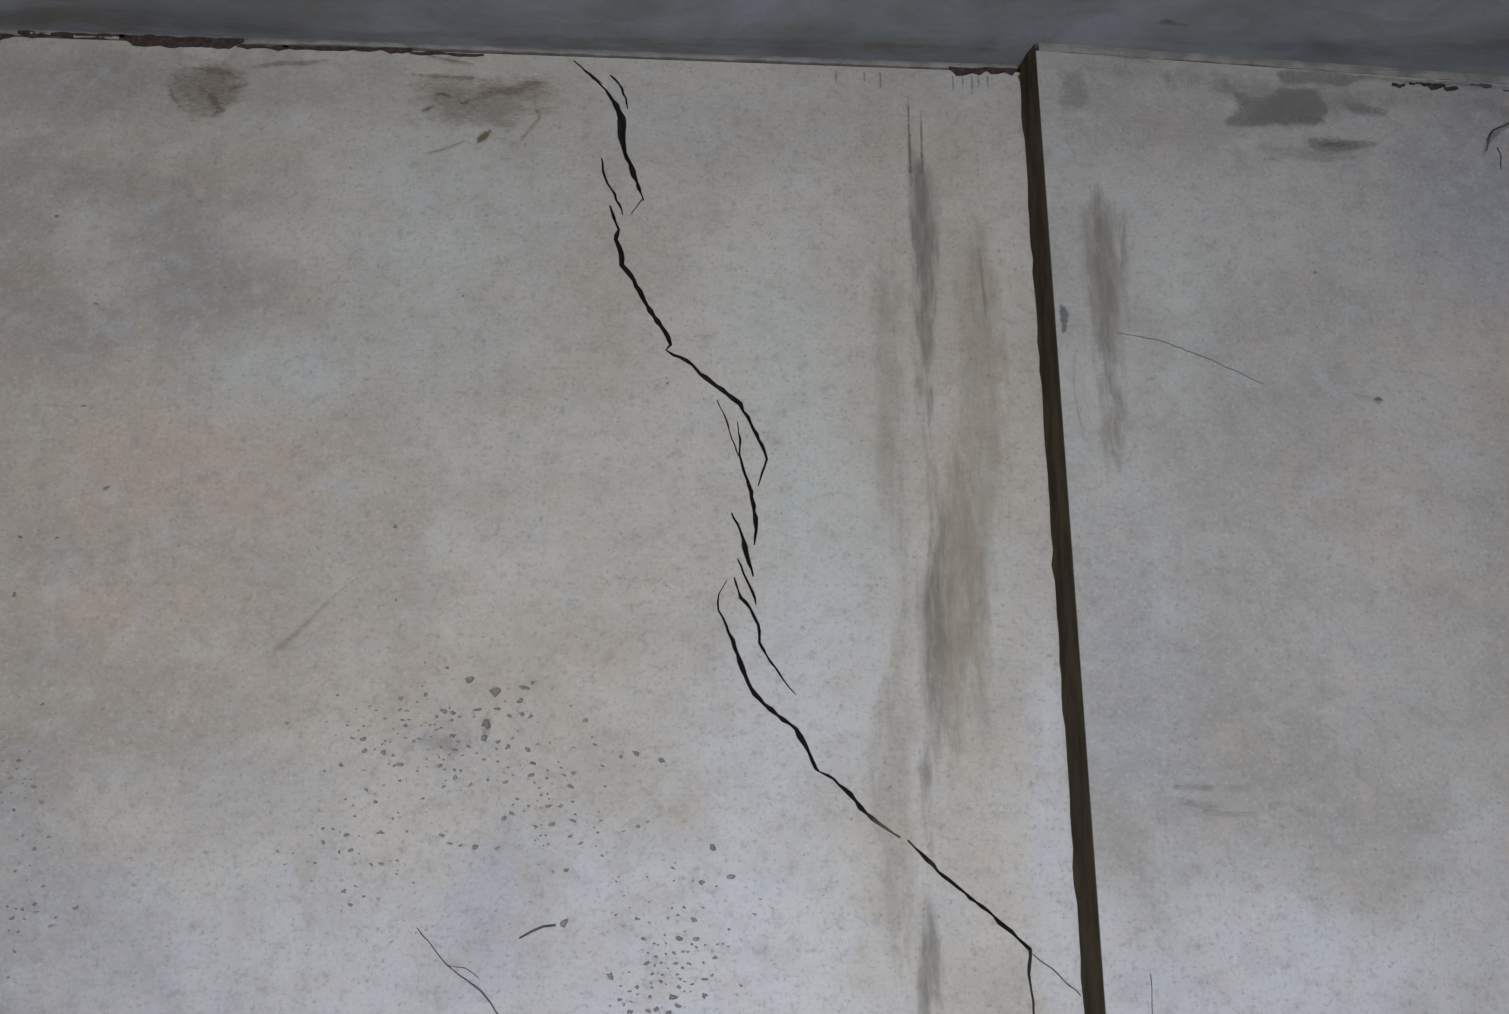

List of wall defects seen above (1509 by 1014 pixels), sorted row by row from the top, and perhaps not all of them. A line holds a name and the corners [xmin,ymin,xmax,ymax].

leakage [907,107,923,173]
crack [1486,90,1509,168]
leakage [1088,196,1117,351]
leakage [1060,305,1068,332]
crack [574,61,1081,1014]
crack [417,928,498,1014]